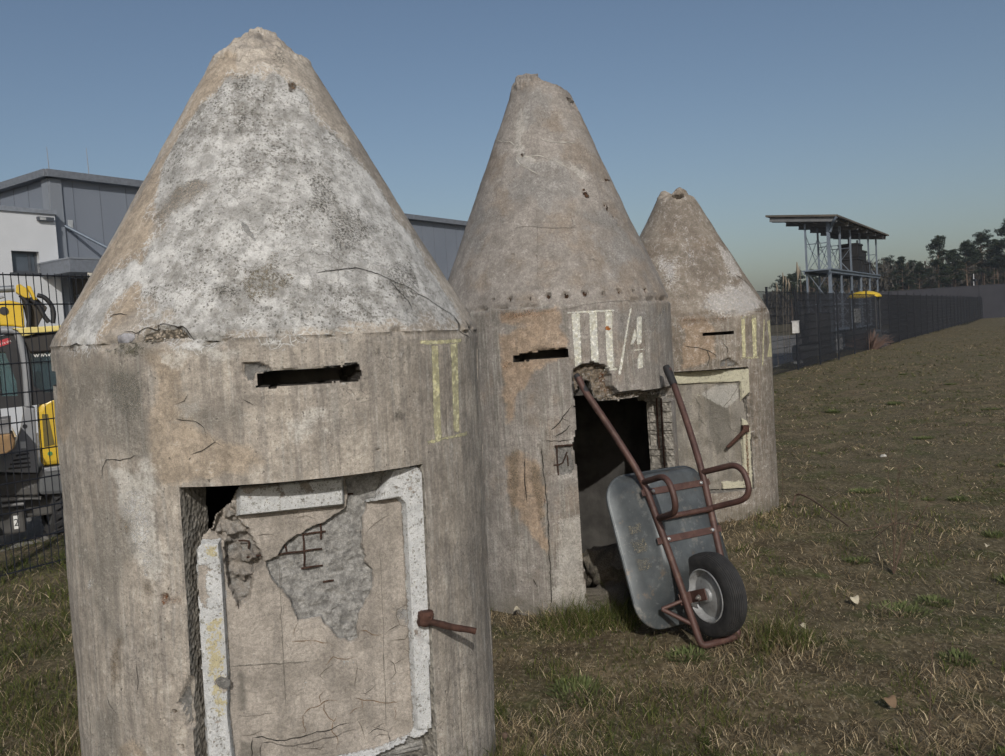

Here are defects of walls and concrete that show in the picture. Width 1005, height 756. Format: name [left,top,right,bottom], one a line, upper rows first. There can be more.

spalling [144,328,191,343]
spalling [573,362,670,400]
crack [178,396,222,454]
crack [231,554,409,756]